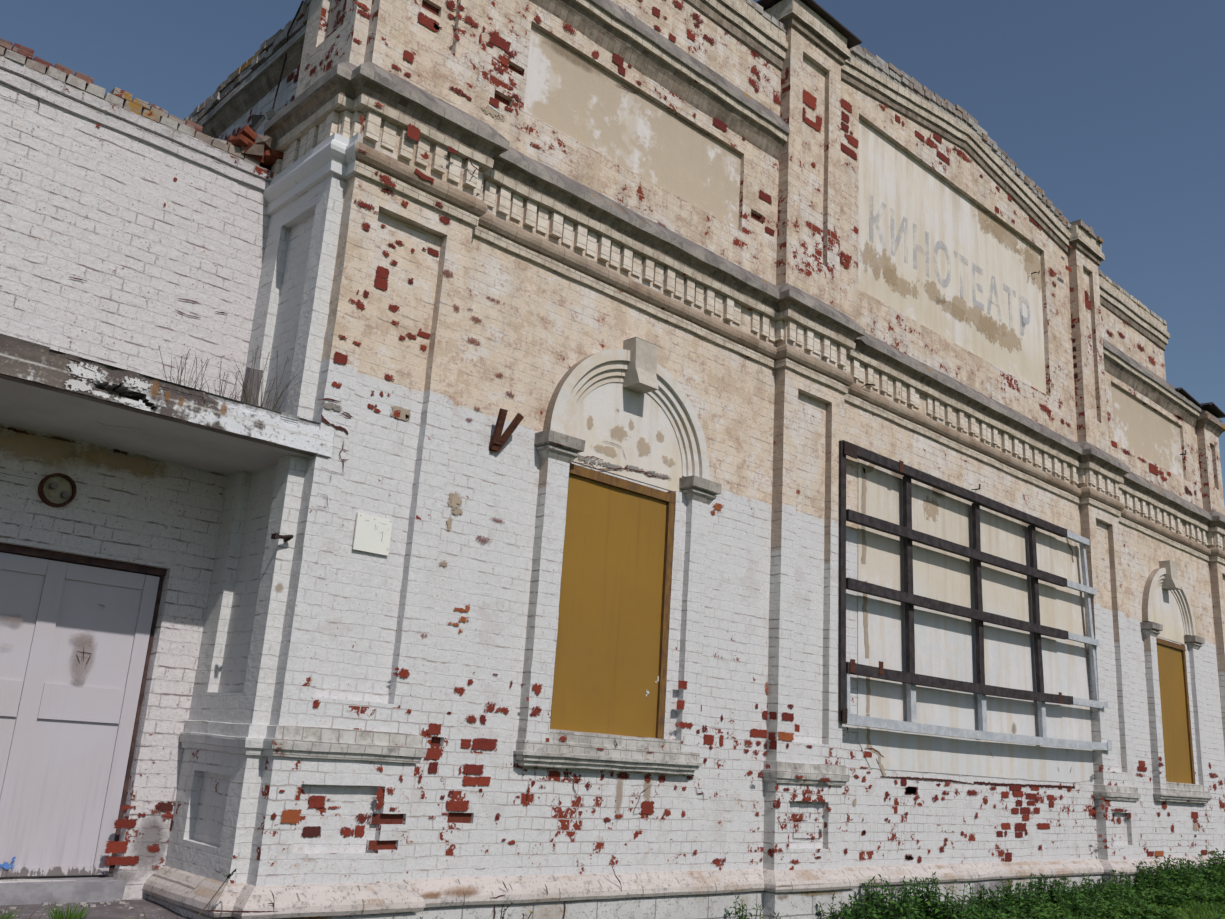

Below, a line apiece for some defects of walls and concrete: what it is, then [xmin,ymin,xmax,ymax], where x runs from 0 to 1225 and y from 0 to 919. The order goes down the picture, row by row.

flaking render [417,0,521,121]
peeling [879,103,983,179]
peeling [751,189,775,236]
spalling [65,361,153,407]
peeling [510,681,542,717]
peeling [418,701,509,823]
peeling [744,703,812,778]
flaking render [854,677,1075,838]
peeling [104,801,175,866]
peeling [271,795,341,837]
spalling [340,766,403,850]
peeling [641,801,686,818]